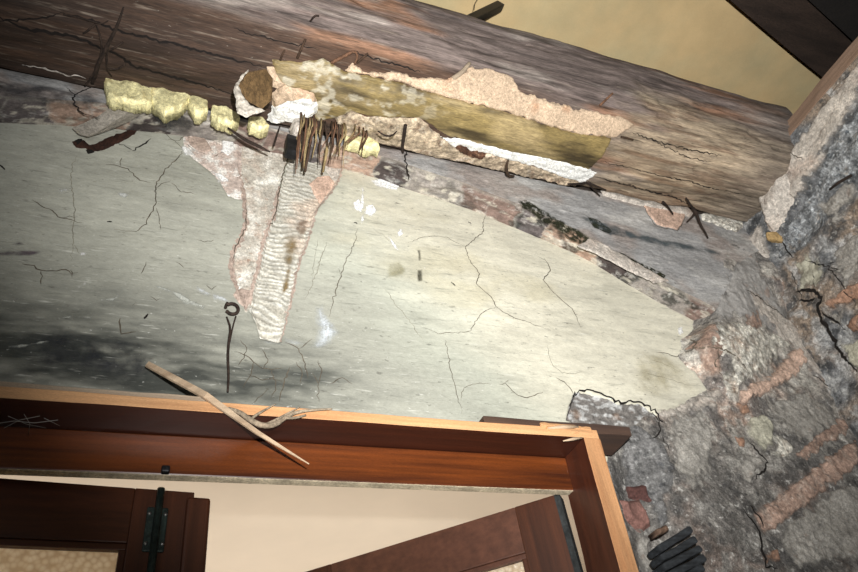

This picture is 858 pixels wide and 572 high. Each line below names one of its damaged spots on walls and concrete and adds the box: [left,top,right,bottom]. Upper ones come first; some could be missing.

crack [0,12,262,96]
crack [108,134,197,232]
spalling [183,136,344,343]
water stain [520,200,589,243]
water stain [588,217,695,249]
crack [632,132,718,162]
crack [236,340,352,404]
water stain [320,312,333,342]
crack [384,218,539,406]
crack [644,339,754,386]
spalling [566,65,858,572]
crack [782,242,858,372]